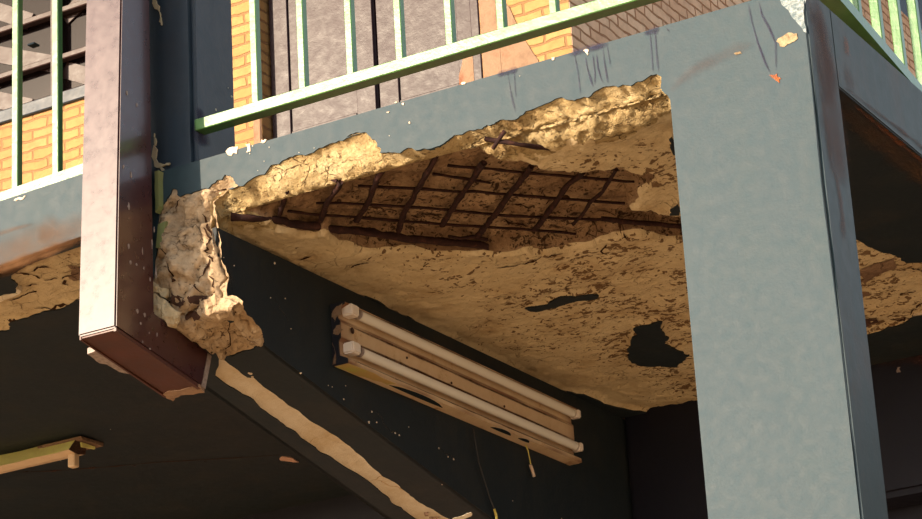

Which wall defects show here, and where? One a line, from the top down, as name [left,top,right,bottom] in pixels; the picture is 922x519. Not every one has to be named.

peeling [0,247,81,330]
spalling [129,75,697,519]
spalling [856,240,922,334]